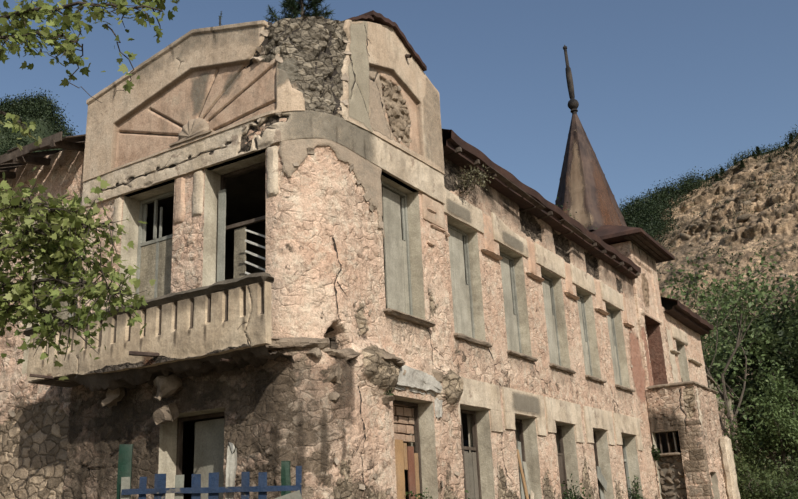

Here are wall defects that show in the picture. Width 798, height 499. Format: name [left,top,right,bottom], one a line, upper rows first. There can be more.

crack [247,16,391,136]
flaking render [252,16,401,143]
crack [332,237,346,320]
flaking render [79,344,258,375]
crack [354,386,378,498]